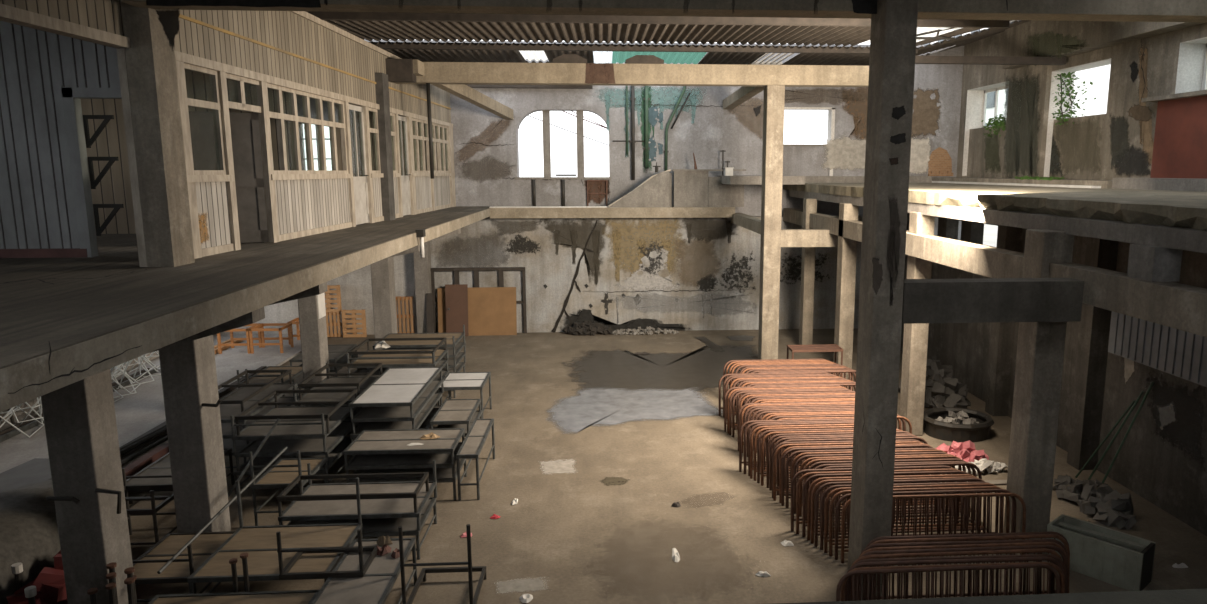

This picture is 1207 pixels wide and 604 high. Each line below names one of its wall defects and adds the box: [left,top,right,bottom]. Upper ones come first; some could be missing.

leakage [605,91,696,156]
flaking render [890,88,953,176]
leakage [493,218,756,322]
crack [8,342,140,394]
peeling [1158,403,1176,430]